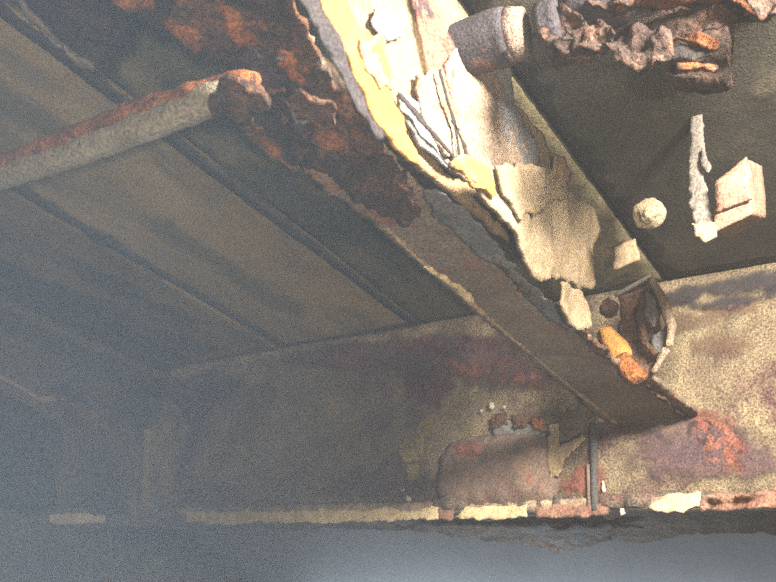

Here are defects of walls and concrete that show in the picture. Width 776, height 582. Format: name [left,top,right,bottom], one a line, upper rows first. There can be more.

corrosion [114,0,155,13]
corrosion [164,17,203,52]
corrosion [216,0,264,46]
corrosion [532,0,776,75]
corrosion [277,49,305,84]
peeling [216,45,355,160]
corrosion [0,69,287,192]
spalling [320,0,600,333]
peeling [49,512,107,525]